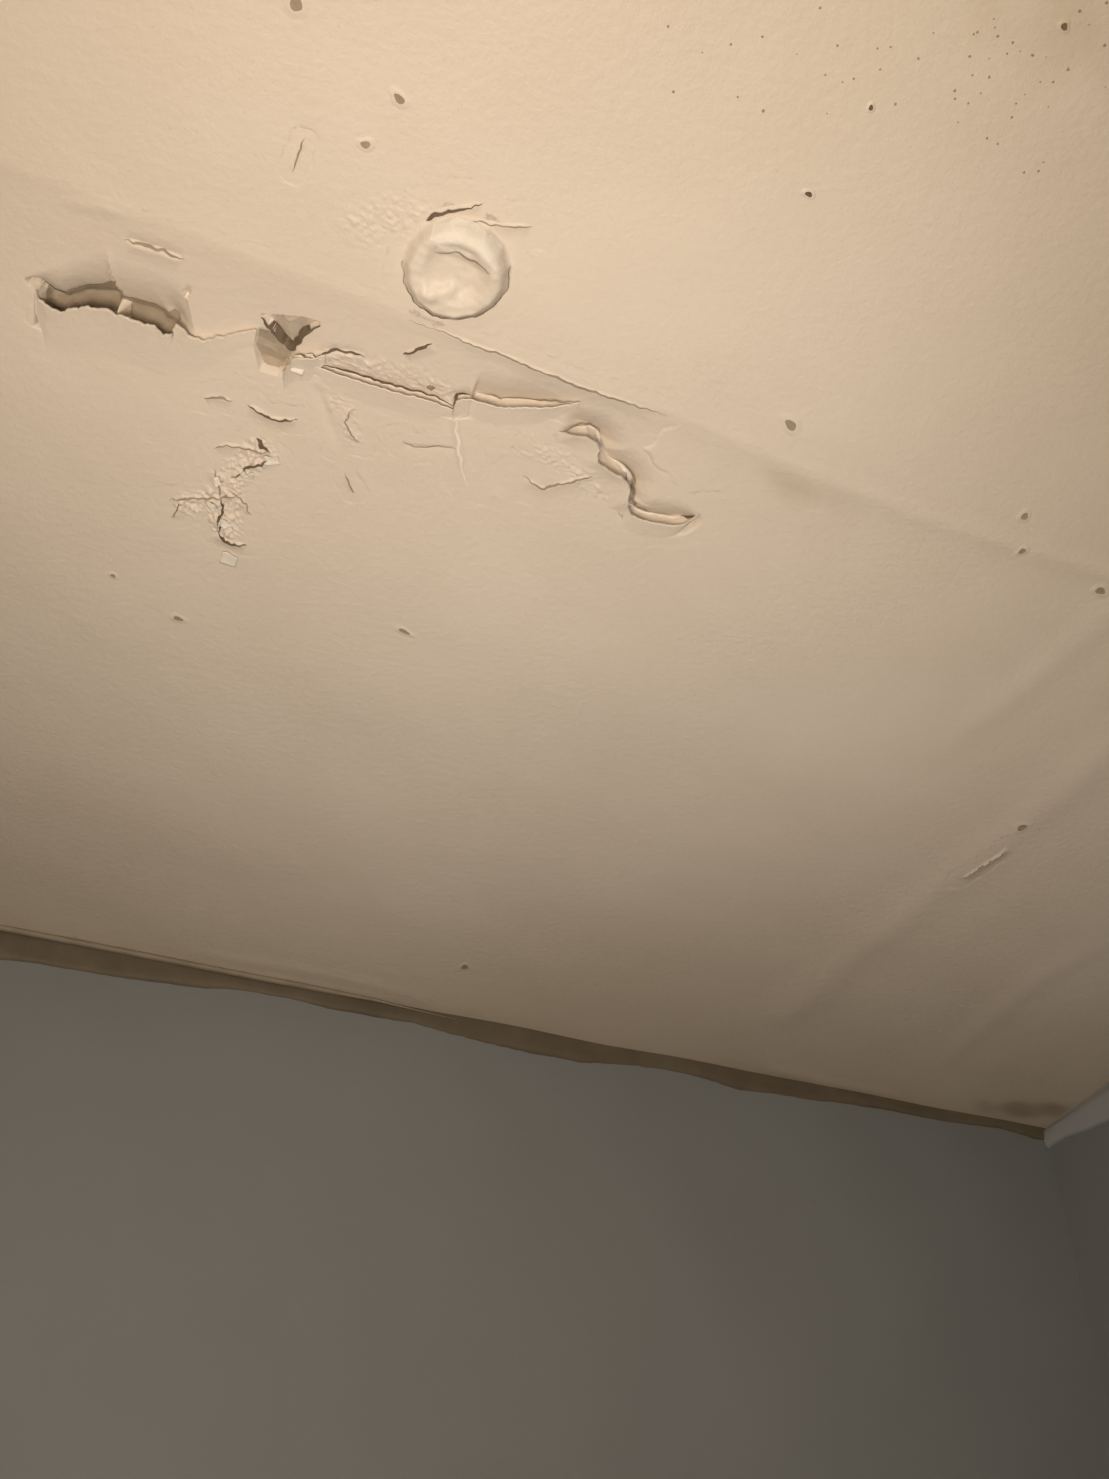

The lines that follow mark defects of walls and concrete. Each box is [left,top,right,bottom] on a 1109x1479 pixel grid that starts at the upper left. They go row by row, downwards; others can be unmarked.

hole [42,279,181,334]
peeling [152,422,293,568]
peeling [257,315,732,547]
crack [319,306,688,428]